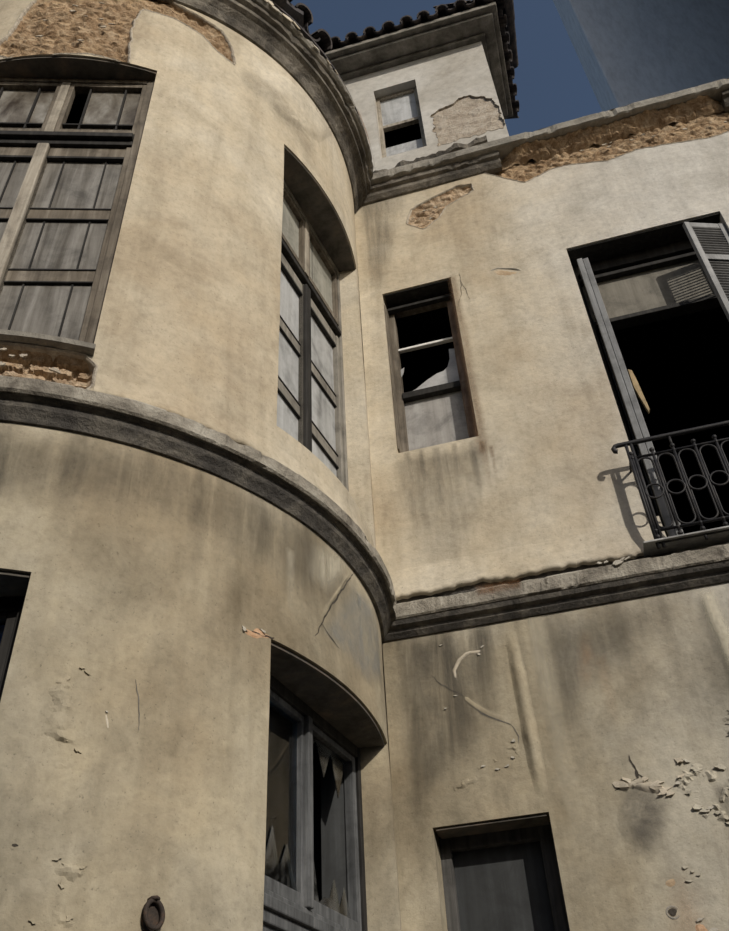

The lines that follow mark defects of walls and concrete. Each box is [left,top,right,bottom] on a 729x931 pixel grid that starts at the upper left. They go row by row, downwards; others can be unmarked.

flaking render [0,0,236,65]
flaking render [431,95,506,146]
flaking render [484,95,729,183]
flaking render [406,183,474,230]
flaking render [0,341,98,390]
crack [315,572,354,648]
damp [705,593,729,657]
peeling [41,666,90,754]
damp [443,644,468,730]
peeling [612,758,729,825]